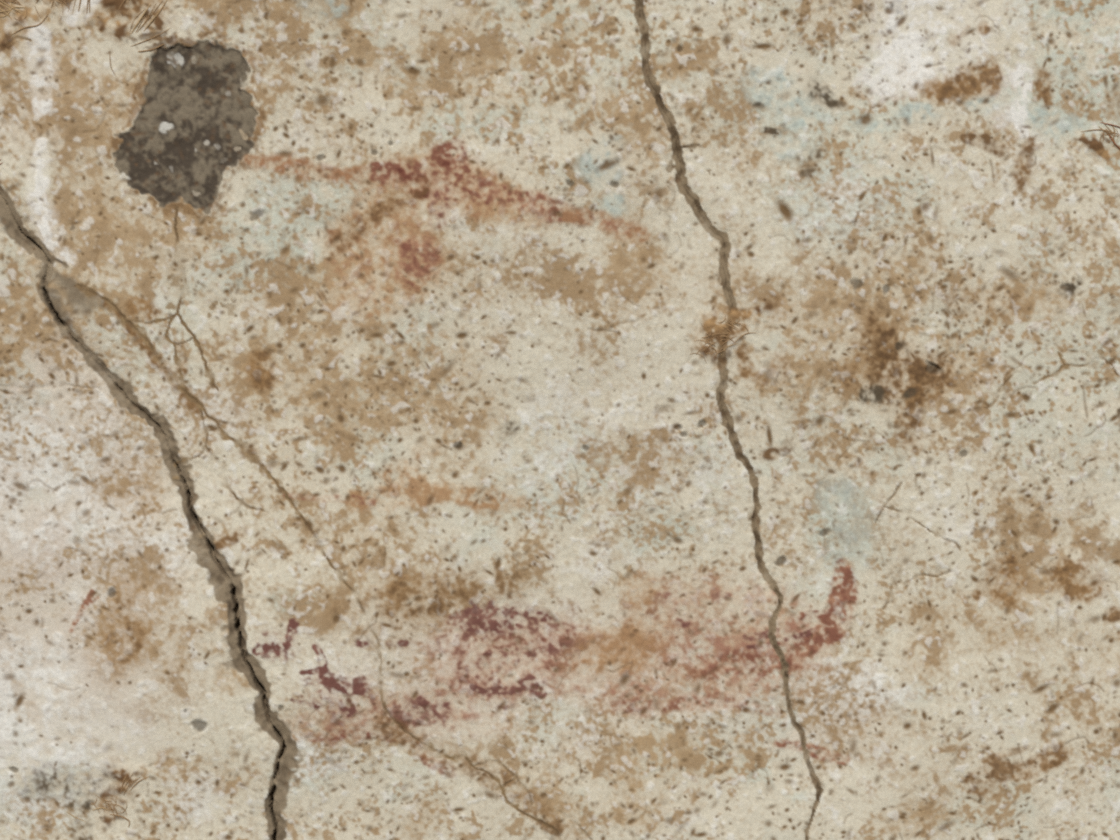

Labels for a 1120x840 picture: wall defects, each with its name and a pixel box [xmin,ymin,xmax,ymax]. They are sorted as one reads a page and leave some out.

crack [38,87,49,95]
spalling [104,27,270,223]
crack [633,0,738,304]
crack [0,187,630,840]
crack [714,369,824,840]